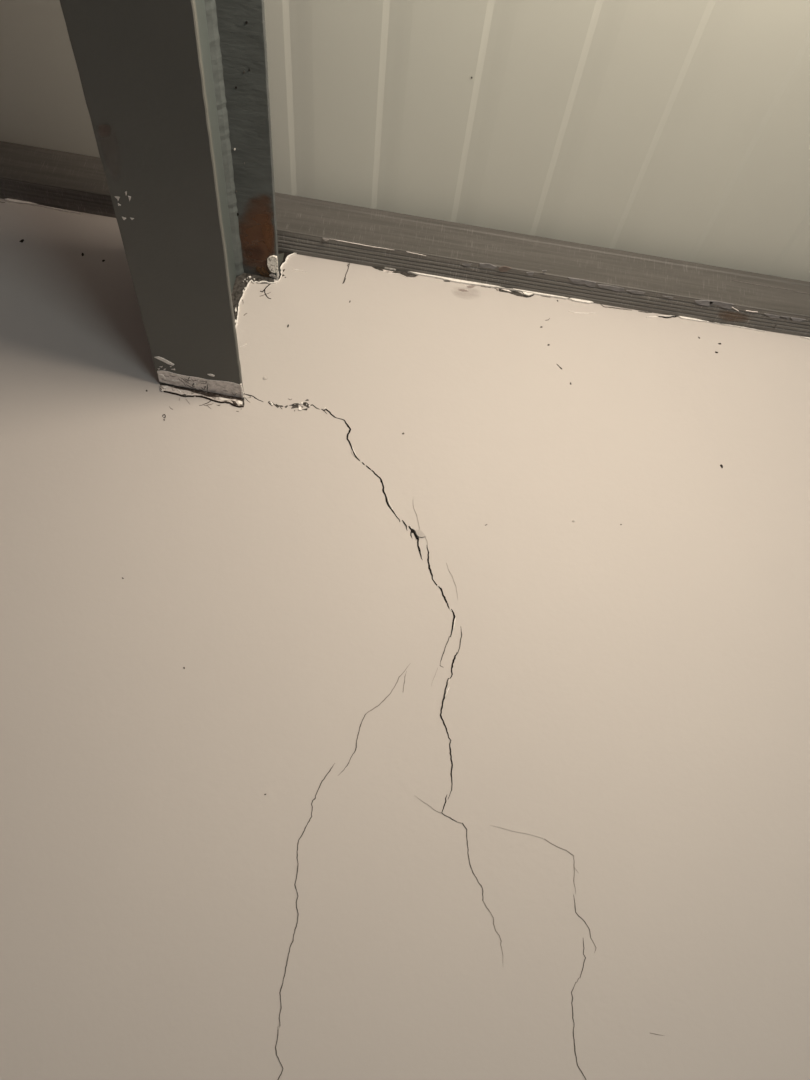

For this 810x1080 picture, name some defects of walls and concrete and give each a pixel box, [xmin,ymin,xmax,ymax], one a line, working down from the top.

rust [240,197,274,278]
crack [275,664,410,1080]
crack [310,404,503,954]
crack [499,827,596,1080]